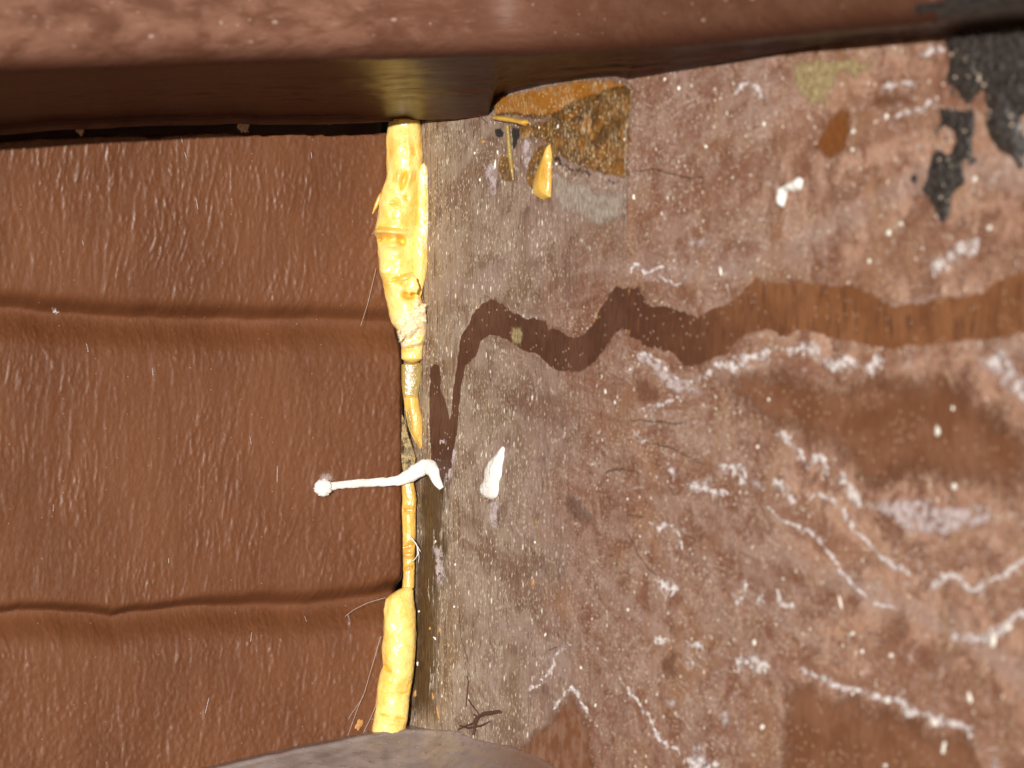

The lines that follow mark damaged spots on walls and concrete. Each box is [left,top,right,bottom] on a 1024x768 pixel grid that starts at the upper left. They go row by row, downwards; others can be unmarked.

water stain [637,348,771,412]
peeling [429,272,1024,498]
water stain [786,341,884,378]
water stain [980,350,1024,402]
water stain [668,467,729,502]
water stain [720,463,796,506]
water stain [775,431,990,575]
water stain [766,506,897,611]
water stain [929,559,1024,593]
water stain [736,655,770,674]
water stain [619,677,720,768]
water stain [800,667,972,740]